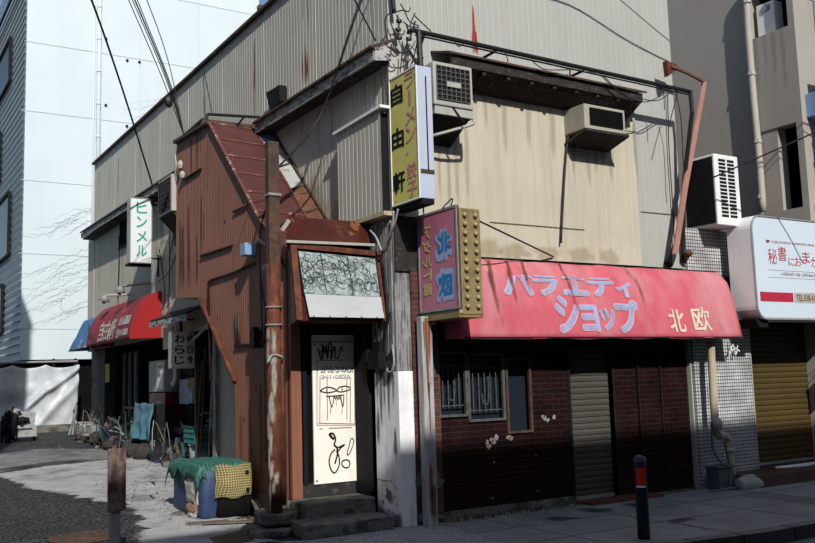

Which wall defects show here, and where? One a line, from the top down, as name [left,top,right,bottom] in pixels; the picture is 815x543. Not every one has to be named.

crack [1,208,91,341]
rust [180,203,204,275]
water stain [376,367,394,438]
peeling [486,434,513,449]